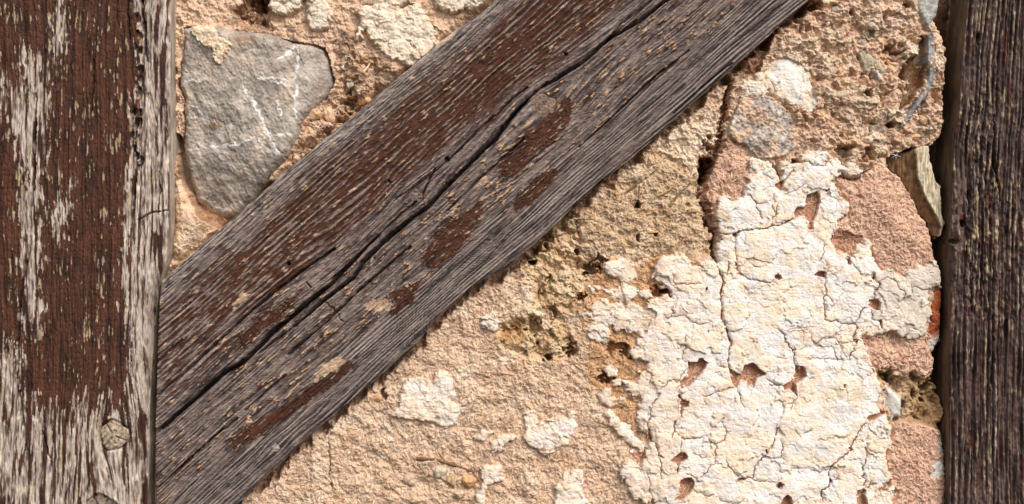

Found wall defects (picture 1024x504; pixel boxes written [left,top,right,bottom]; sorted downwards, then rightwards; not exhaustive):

peeling [0,0,171,504]
crack [162,0,669,428]
flaking render [472,0,947,504]
crack [646,70,931,503]